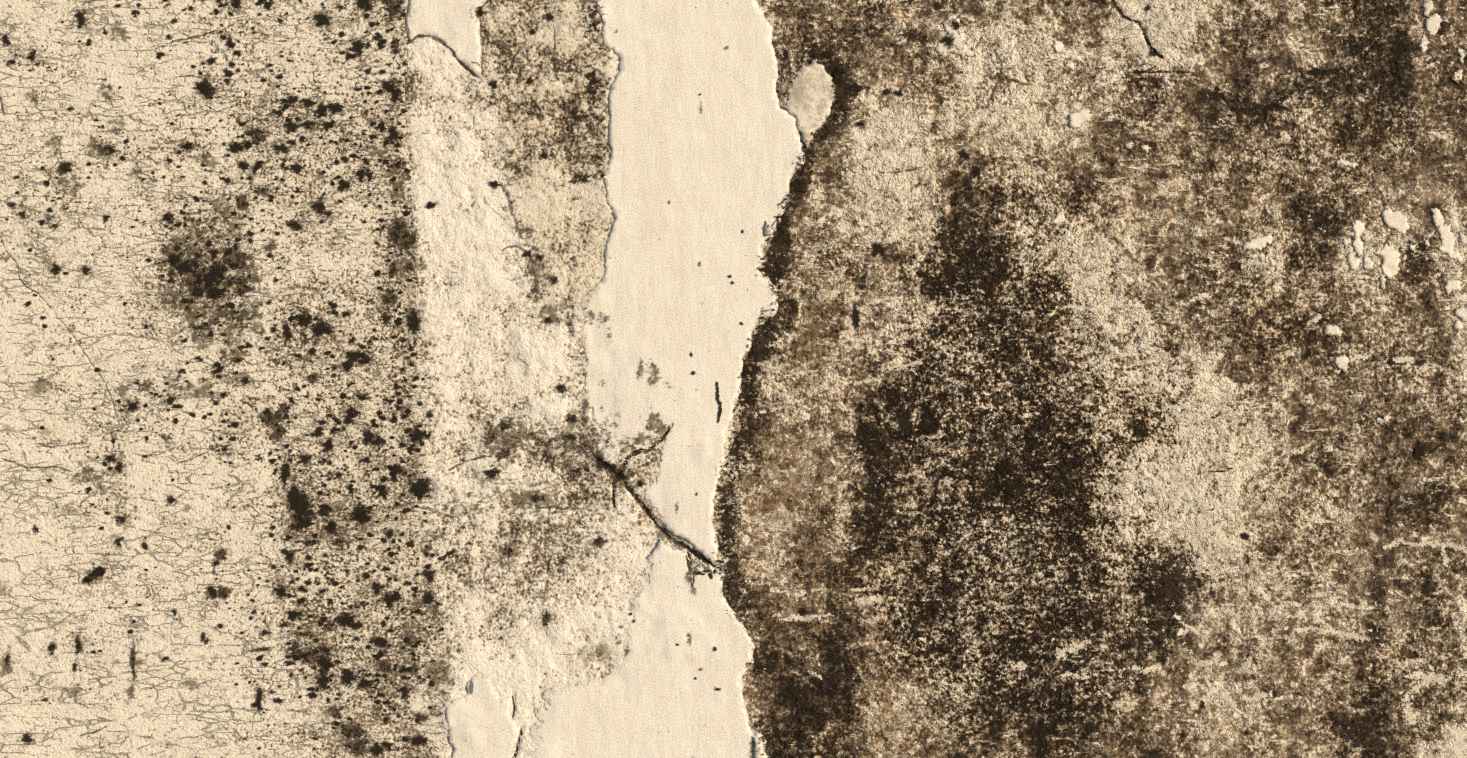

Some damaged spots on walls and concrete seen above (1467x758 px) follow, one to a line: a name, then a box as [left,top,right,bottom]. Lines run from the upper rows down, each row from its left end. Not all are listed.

peeling [405,0,486,77]
leakage [1233,0,1278,72]
leakage [1205,45,1363,124]
peeling [445,0,836,758]
leakage [1393,355,1436,371]
leakage [1412,431,1447,458]
crack [592,423,720,585]
leakage [1122,352,1277,726]
leakage [1383,538,1467,567]
leakage [1293,625,1370,643]
leakage [1301,658,1450,758]